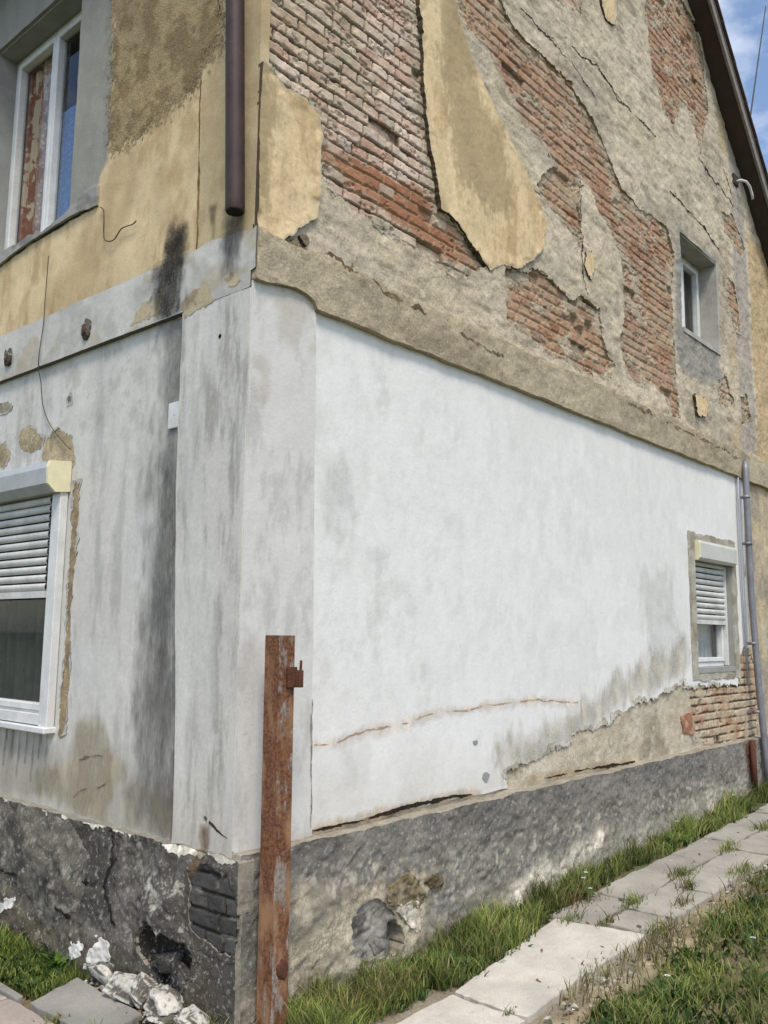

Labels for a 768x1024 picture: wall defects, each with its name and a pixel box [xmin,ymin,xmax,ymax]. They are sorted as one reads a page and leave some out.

peeling [102,0,226,158]
crack [521,8,656,137]
damp [165,224,186,276]
flaking render [253,0,749,459]
peeling [0,425,83,739]
damp [134,429,177,827]
crack [310,697,582,826]
flaking render [502,652,758,780]
crack [81,830,116,926]
flaking render [132,844,239,994]
rust [276,959,289,980]
spalling [288,869,444,996]